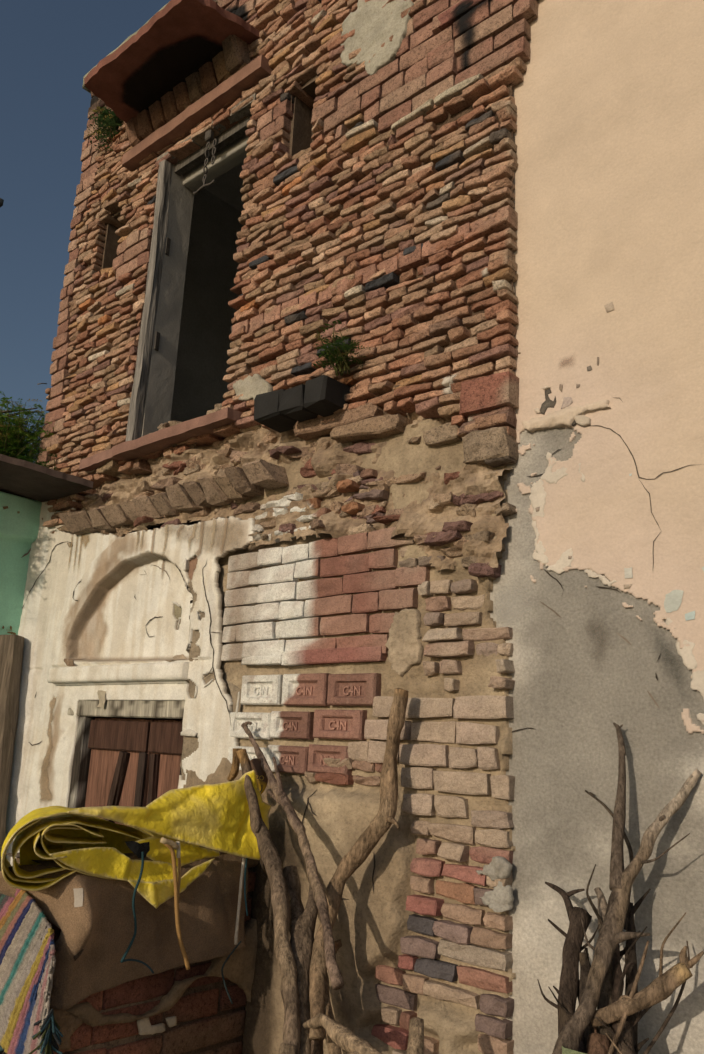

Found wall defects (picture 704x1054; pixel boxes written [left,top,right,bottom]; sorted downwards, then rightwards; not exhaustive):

peeling [55,384,704,1054]
crack [592,425,701,564]